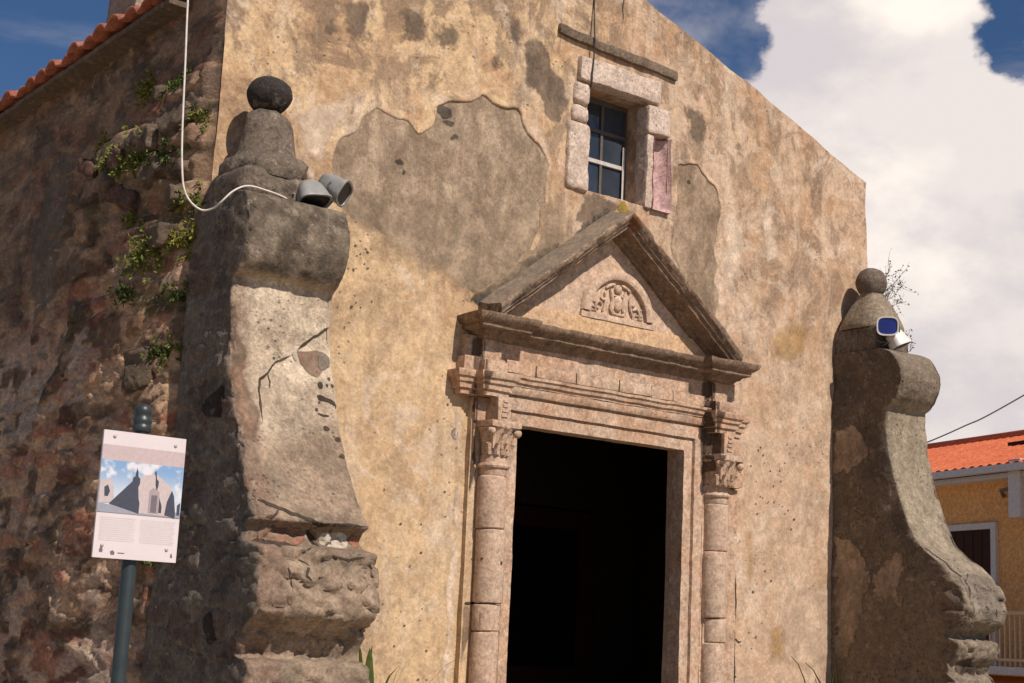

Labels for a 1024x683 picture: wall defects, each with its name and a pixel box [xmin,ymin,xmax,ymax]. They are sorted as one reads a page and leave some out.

peeling [323,85,562,302]
peeling [666,159,726,321]
crack [258,327,329,419]
spalling [293,350,334,411]
crack [317,395,336,417]